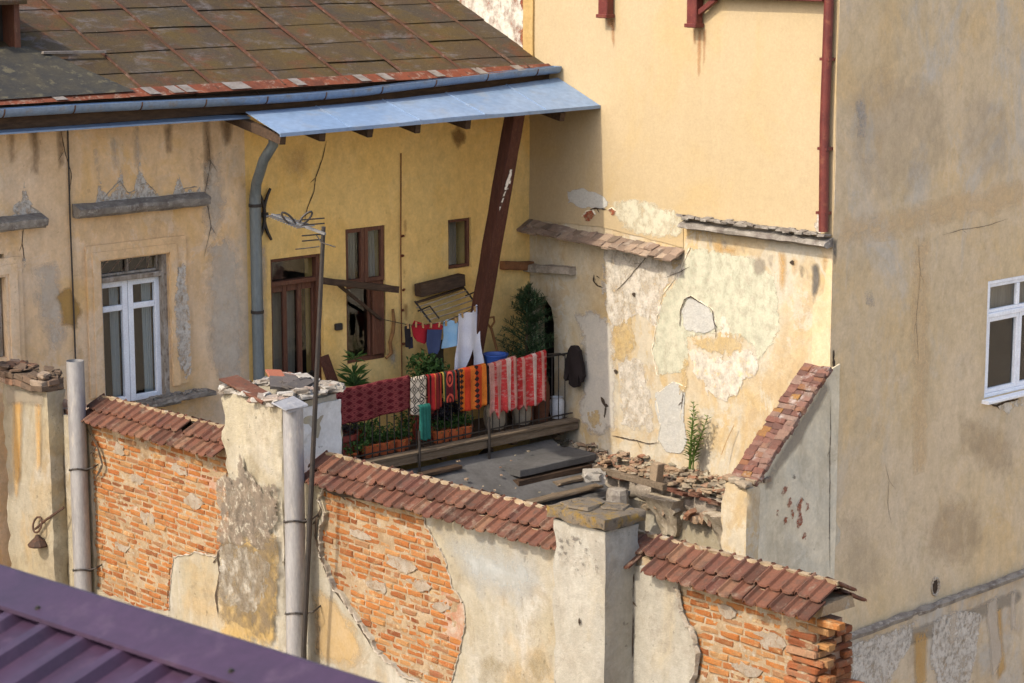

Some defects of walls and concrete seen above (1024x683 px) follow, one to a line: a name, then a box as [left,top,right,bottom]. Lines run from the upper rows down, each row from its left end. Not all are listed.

flaking render [96,162,158,202]
crack [204,131,217,256]
crack [305,141,327,218]
peeling [567,188,683,238]
flaking render [174,263,192,380]
peeling [575,247,780,454]
spalling [91,426,270,612]
flaking render [776,484,809,539]
spalling [317,488,466,683]
spalling [672,586,845,683]
flaking render [852,620,918,683]
flaking render [930,611,982,683]